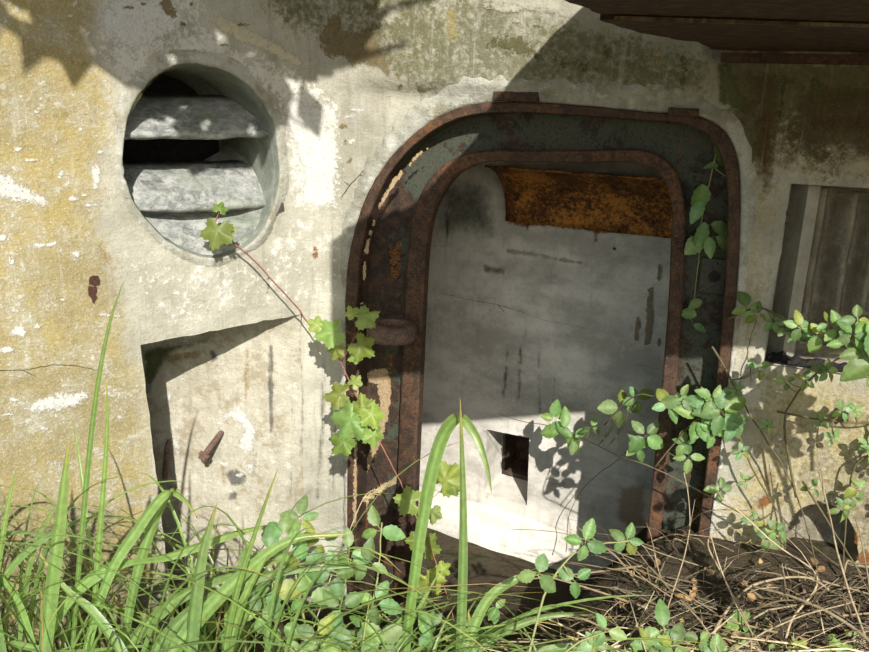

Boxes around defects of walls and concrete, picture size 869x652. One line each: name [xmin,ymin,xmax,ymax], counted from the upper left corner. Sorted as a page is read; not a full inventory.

peeling [86,0,202,60]
peeling [319,14,390,76]
peeling [0,170,49,209]
peeling [378,147,428,210]
peeling [363,220,375,281]
corrosion [88,275,100,303]
corrosion [691,486,703,524]